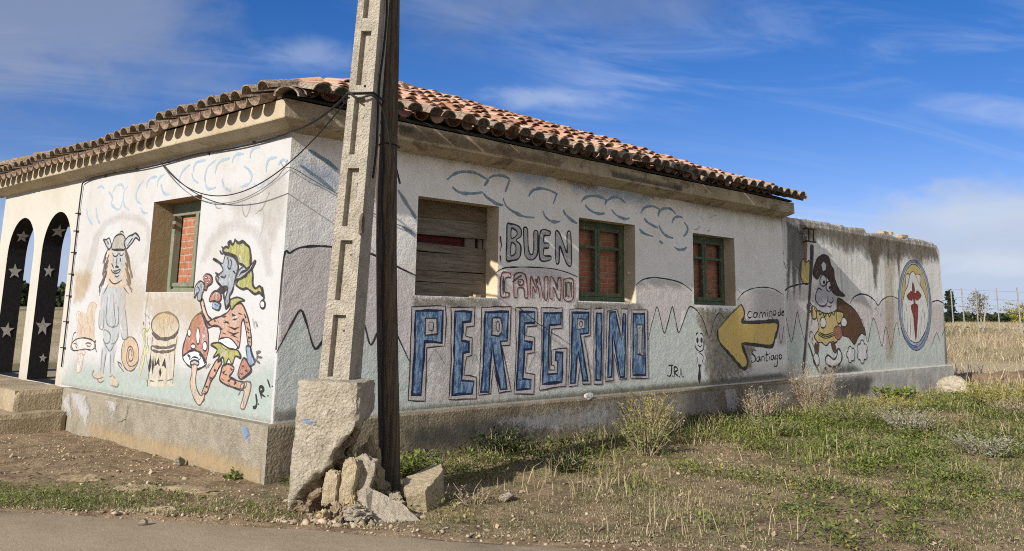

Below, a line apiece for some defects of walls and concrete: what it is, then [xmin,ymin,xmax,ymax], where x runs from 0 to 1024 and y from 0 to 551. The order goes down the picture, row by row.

water stain [781,218,939,298]
spalling [291,424,363,514]